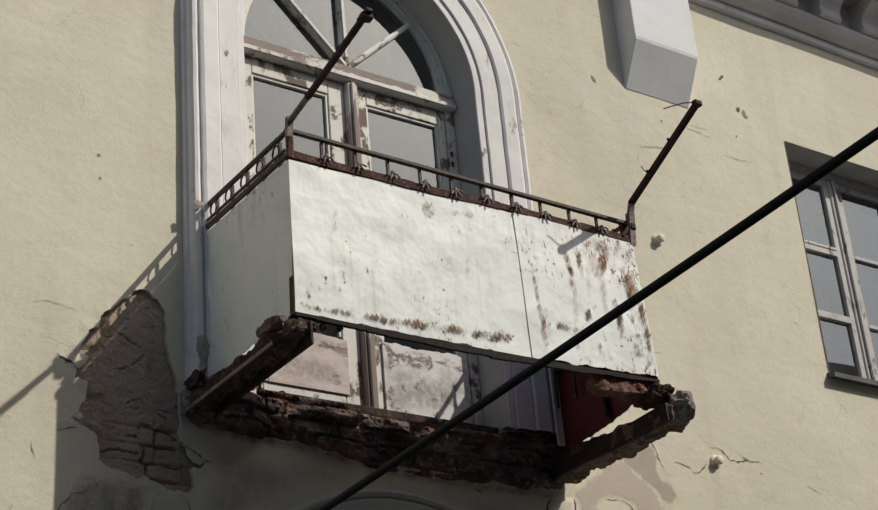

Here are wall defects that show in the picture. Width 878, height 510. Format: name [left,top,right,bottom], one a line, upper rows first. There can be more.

rust [565,240,631,291]
rust [367,314,429,329]
rust [474,330,514,340]
rust [615,299,651,365]
flaking render [196,336,210,370]
peeling [389,352,463,372]
flaking render [72,290,203,493]
peeling [623,444,676,500]
crack [652,444,758,473]